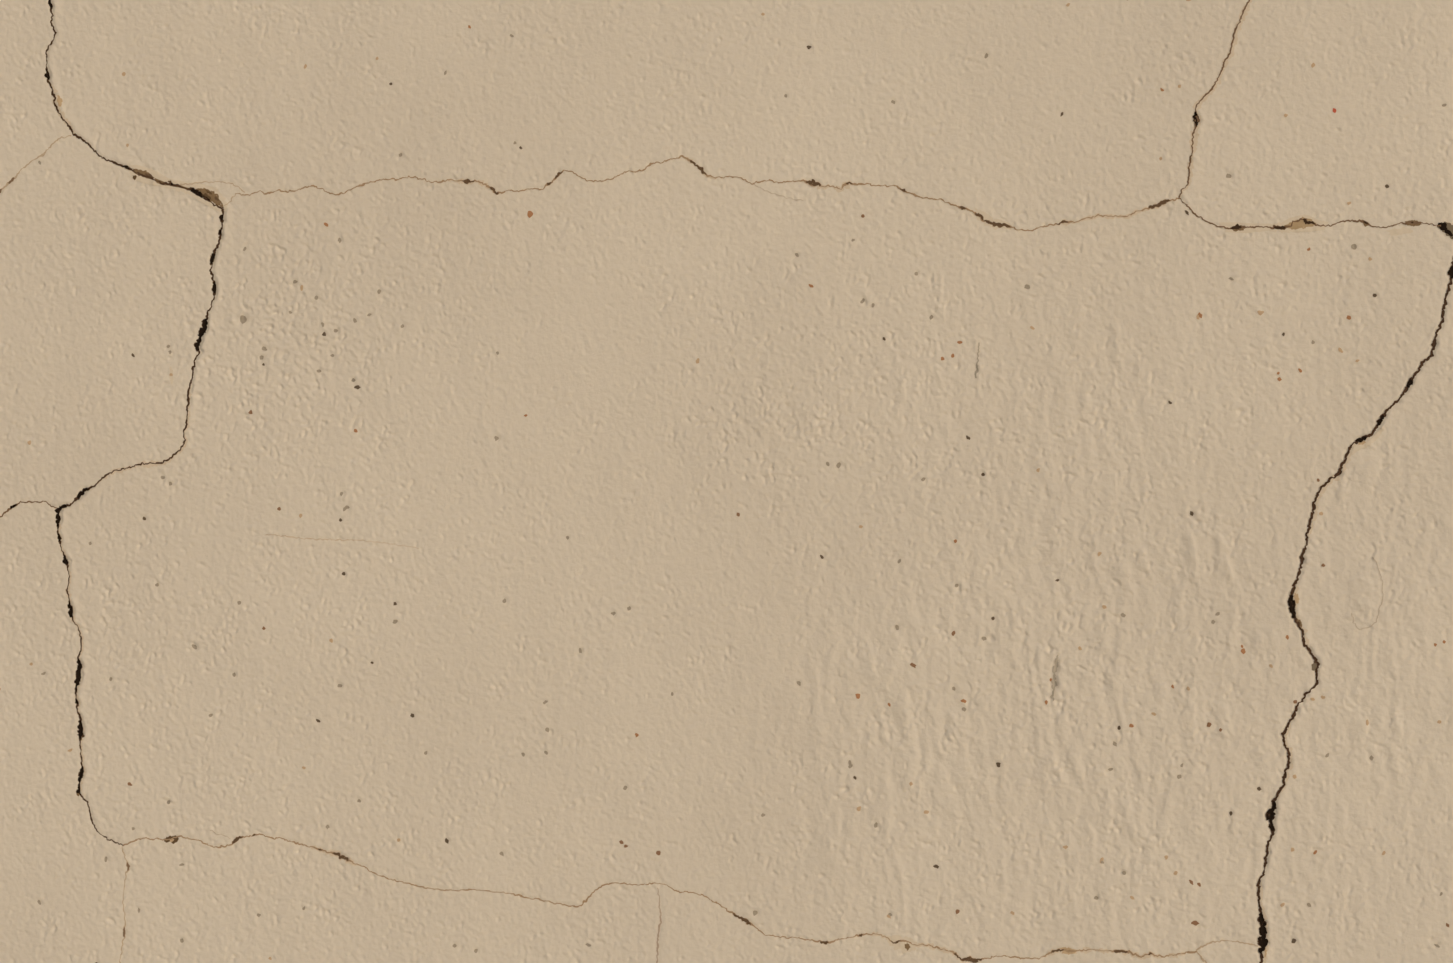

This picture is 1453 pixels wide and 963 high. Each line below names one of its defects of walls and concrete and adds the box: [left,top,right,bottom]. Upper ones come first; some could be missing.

crack [224,0,1441,231]
crack [0,0,227,963]
crack [123,833,1258,963]
crack [1256,261,1453,963]